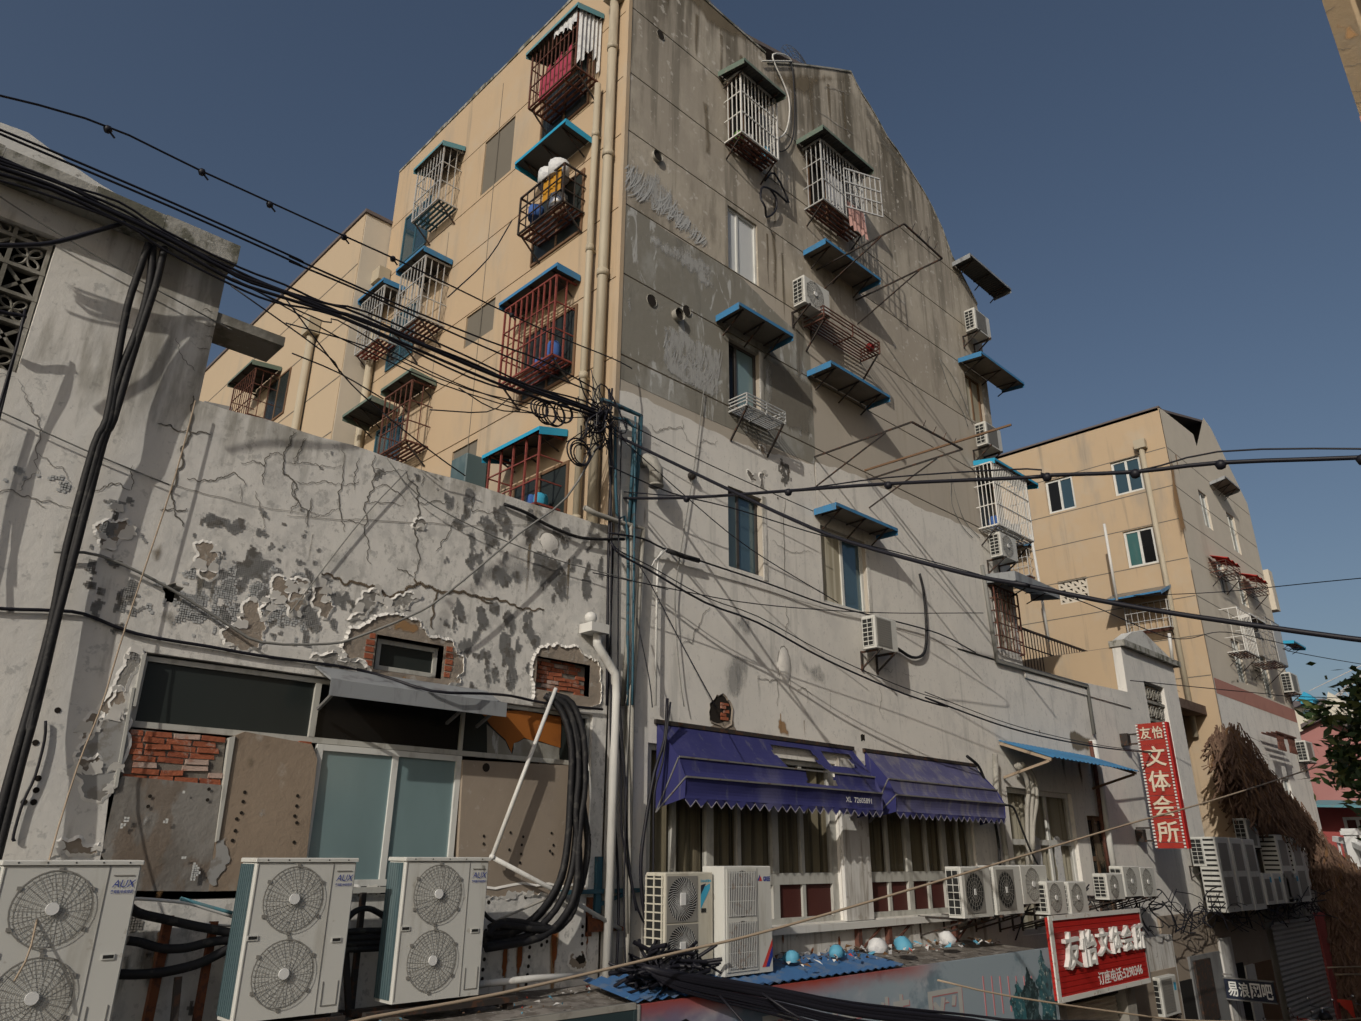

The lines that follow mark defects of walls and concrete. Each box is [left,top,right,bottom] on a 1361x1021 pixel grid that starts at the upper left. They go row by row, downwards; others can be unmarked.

water stain [692,0,754,52]
water stain [776,74,846,131]
water stain [625,164,710,286]
water stain [766,201,784,302]
water stain [766,318,813,436]
crack [0,308,600,629]
peeling [83,477,604,710]
flaking render [67,644,144,804]